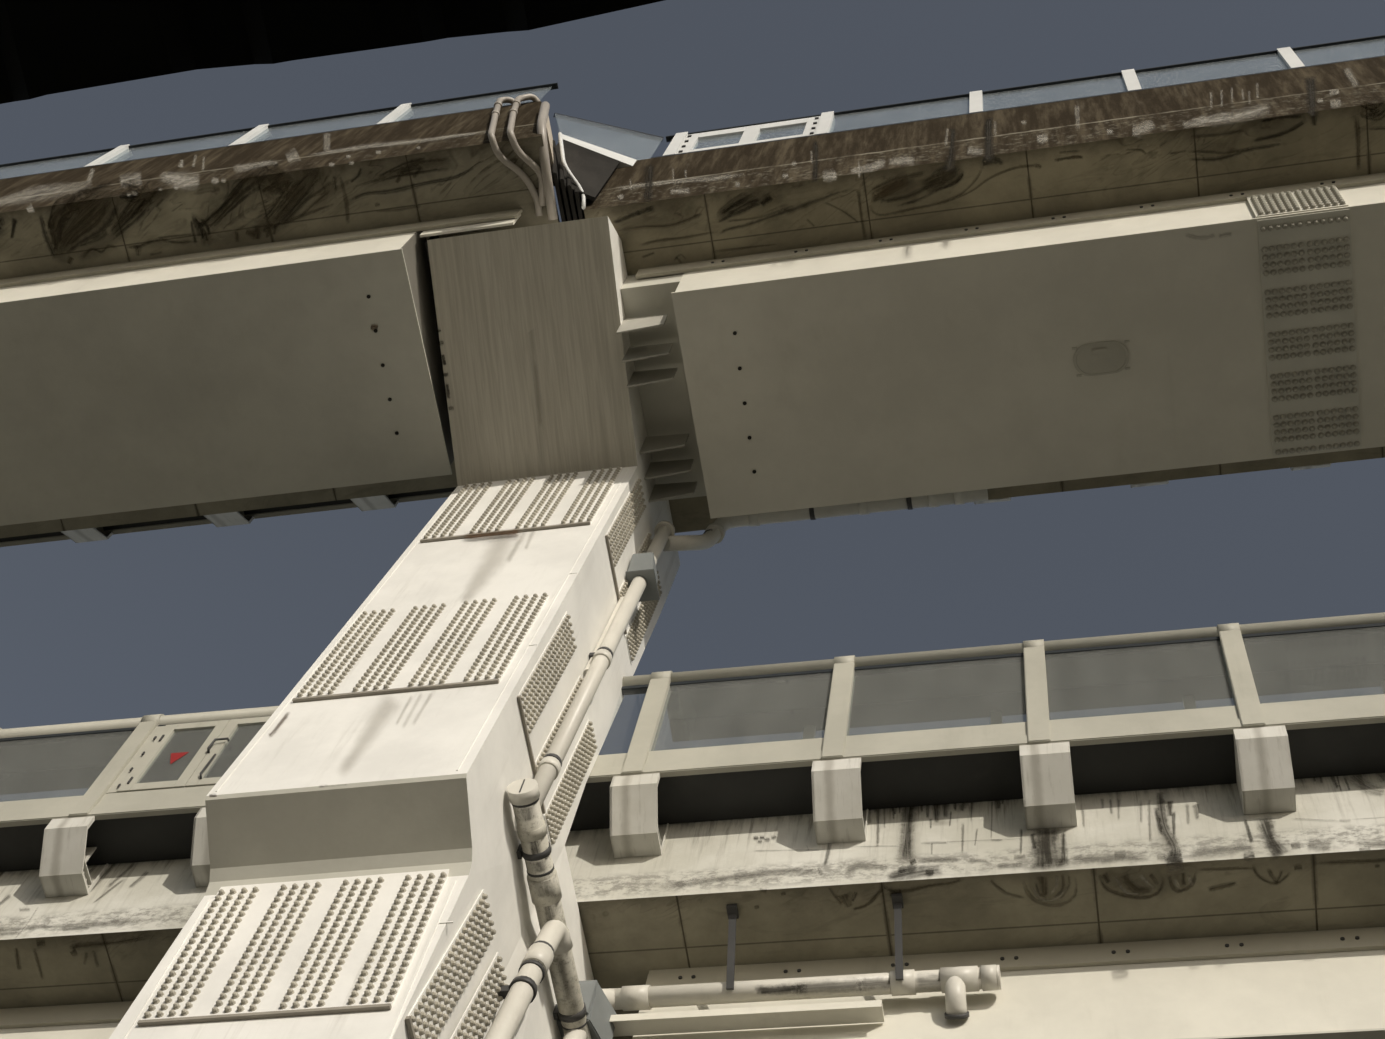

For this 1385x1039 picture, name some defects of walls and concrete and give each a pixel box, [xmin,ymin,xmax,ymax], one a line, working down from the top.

damp [676,869,800,907]
damp [869,800,1004,864]
damp [1000,829,1194,899]
damp [1156,795,1180,855]
damp [1197,819,1385,884]